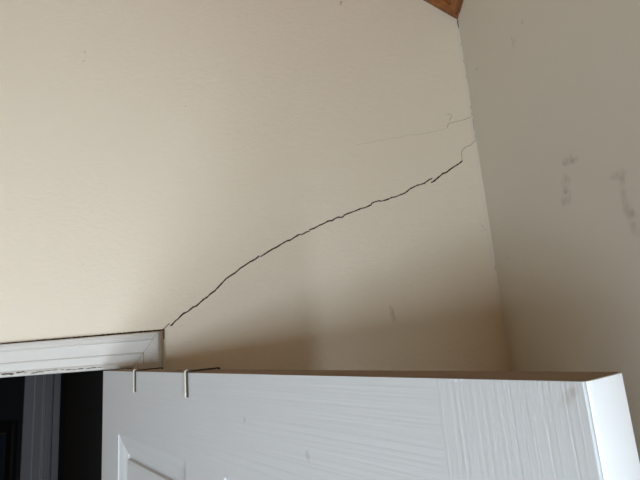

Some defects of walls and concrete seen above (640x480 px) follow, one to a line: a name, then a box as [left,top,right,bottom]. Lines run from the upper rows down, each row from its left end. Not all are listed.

crack [164,106,476,329]